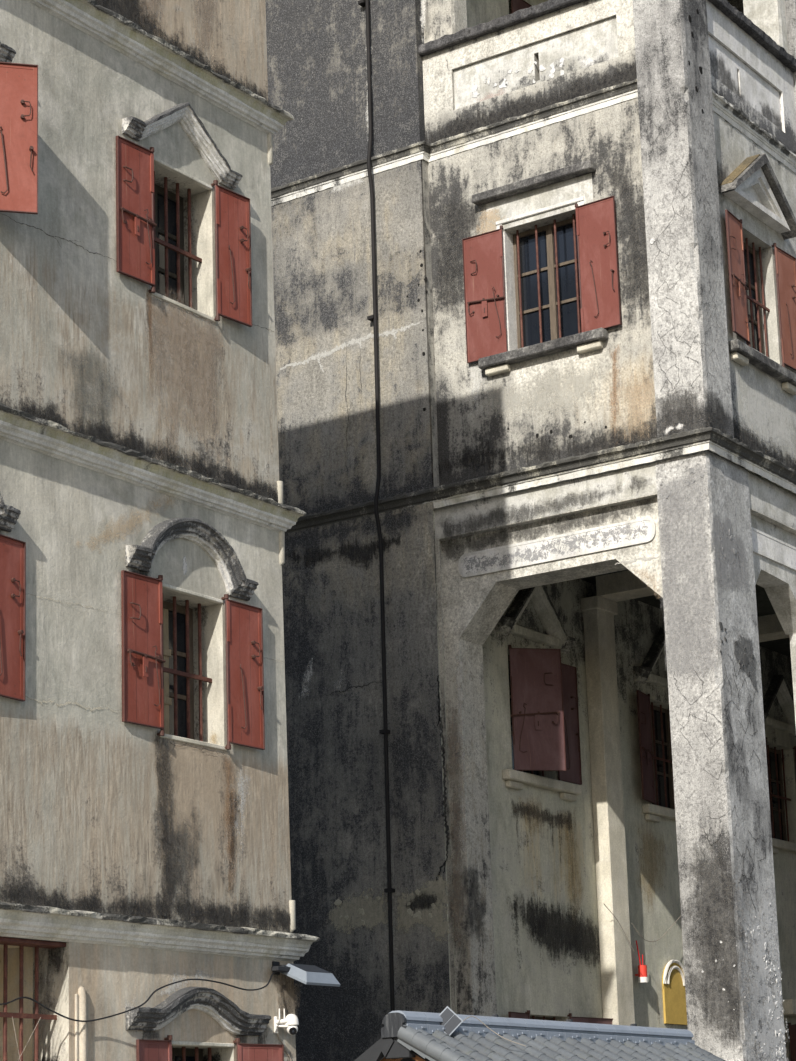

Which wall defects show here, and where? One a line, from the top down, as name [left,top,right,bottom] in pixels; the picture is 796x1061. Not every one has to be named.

leakage [425,63,637,143]
crack [3,214,114,260]
leakage [16,301,278,503]
peeling [463,521,648,574]
leakage [0,731,291,931]
leakage [510,895,600,966]